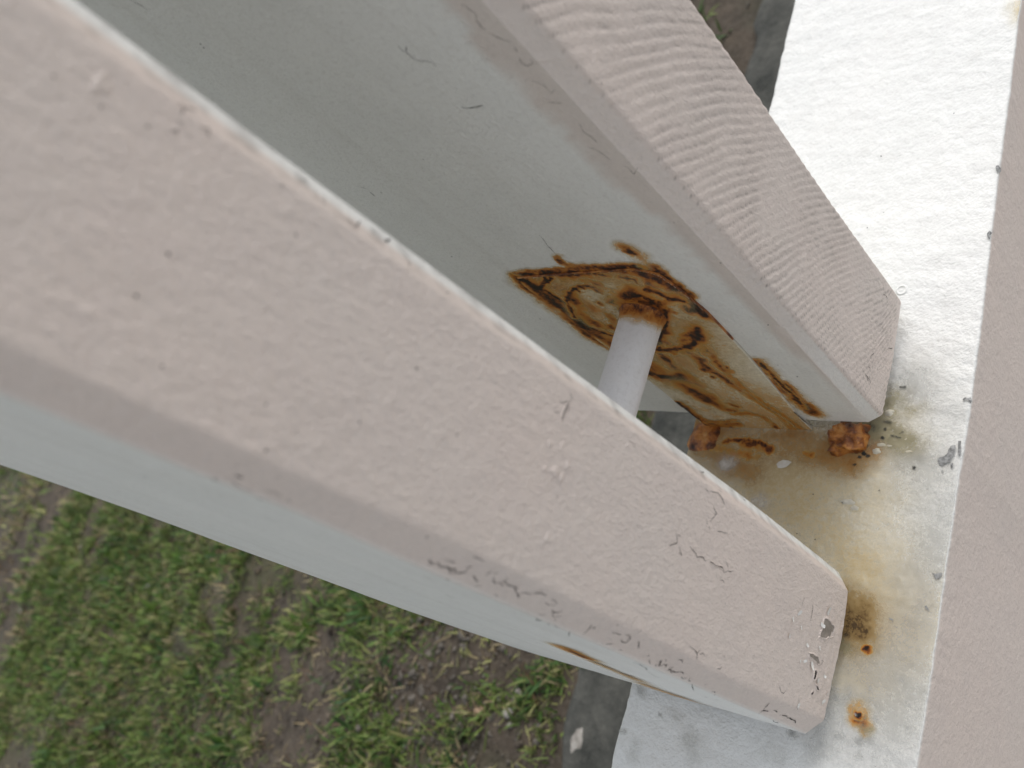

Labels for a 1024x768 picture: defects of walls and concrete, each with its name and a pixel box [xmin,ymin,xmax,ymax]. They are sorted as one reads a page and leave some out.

corrosion [508,242,871,457]
leakage [687,386,938,702]
peeling [798,608,835,709]
corrosion [840,586,878,655]
corrosion [848,702,873,736]